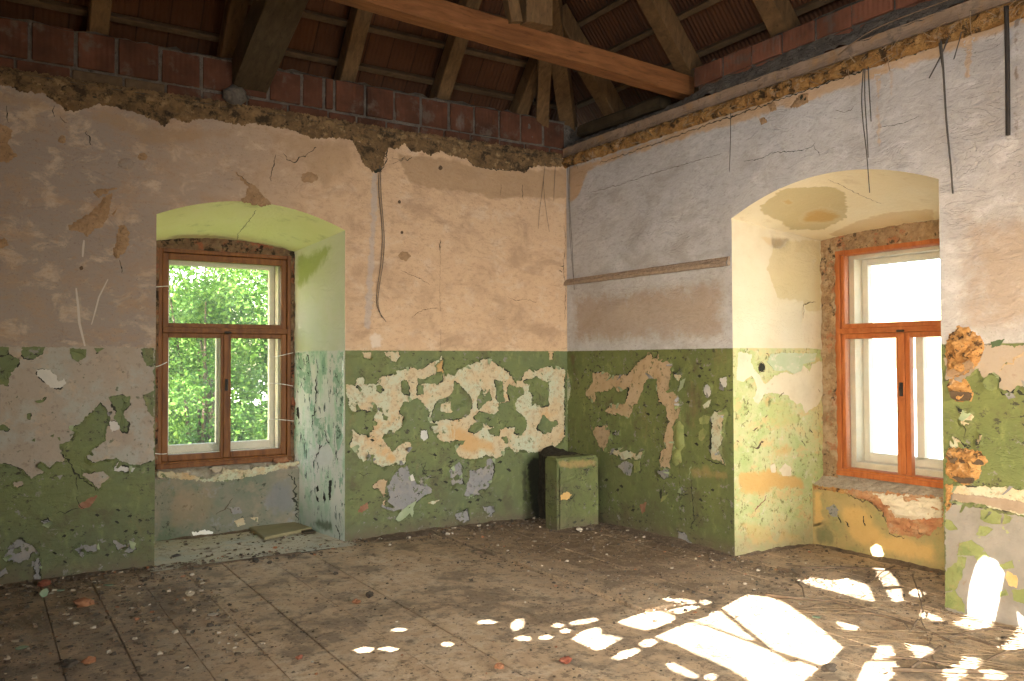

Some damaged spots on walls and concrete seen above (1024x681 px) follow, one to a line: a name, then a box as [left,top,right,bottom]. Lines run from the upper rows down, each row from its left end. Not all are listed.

flaking render [68,188,130,259]
flaking render [235,172,271,207]
flaking render [0,66,563,173]
water stain [757,185,1024,348]
peeling [0,346,299,528]
peeling [295,351,572,525]
peeling [585,302,823,502]
peeling [813,325,1024,629]